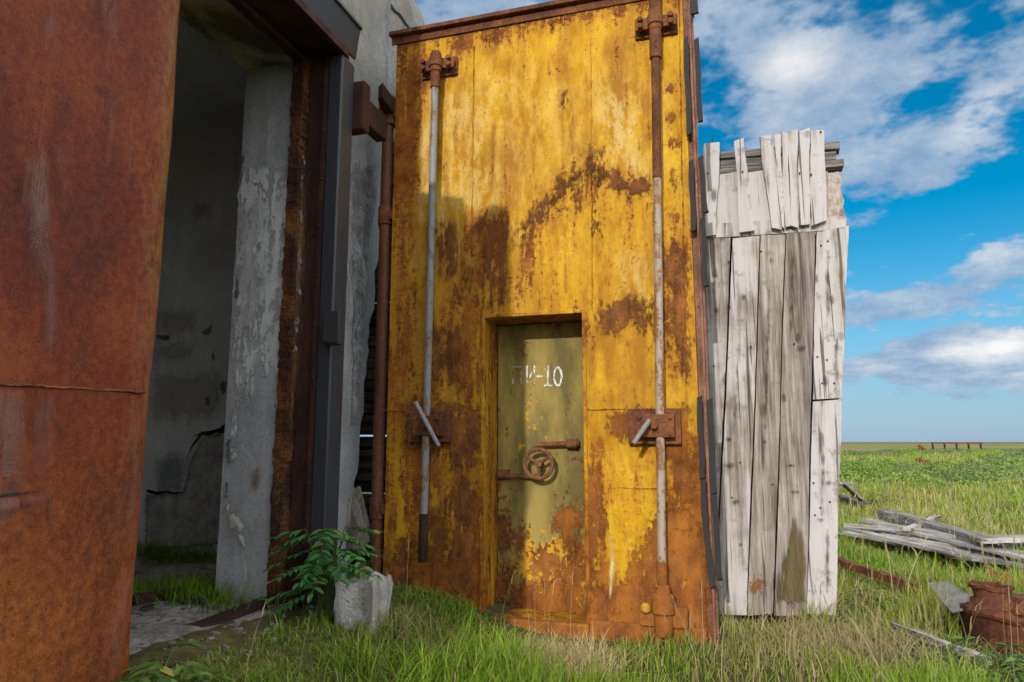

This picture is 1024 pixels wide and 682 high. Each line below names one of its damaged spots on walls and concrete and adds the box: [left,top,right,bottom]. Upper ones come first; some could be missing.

rust [435,144,652,308]
peeling [145,152,288,549]
rust [594,246,695,382]
crack [146,488,183,496]
crack [188,424,225,455]
rust [497,402,717,641]
water stain [750,519,805,604]